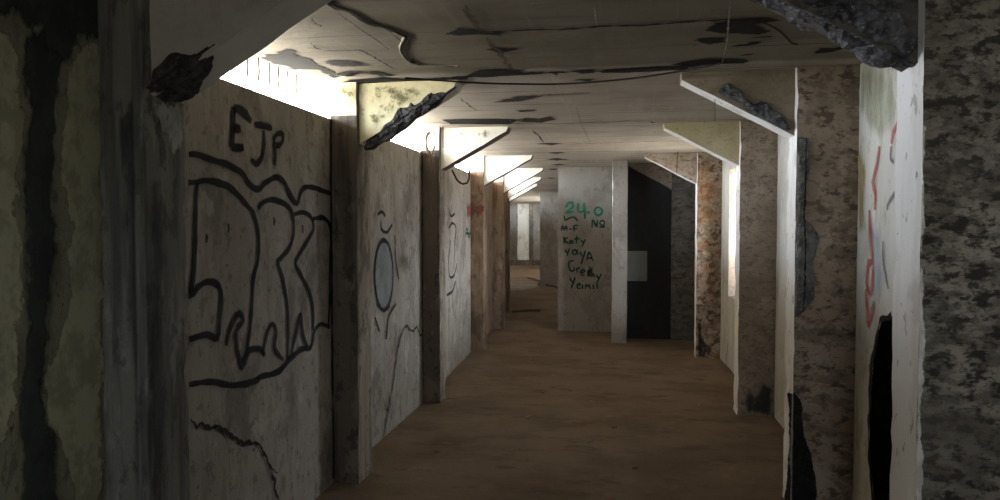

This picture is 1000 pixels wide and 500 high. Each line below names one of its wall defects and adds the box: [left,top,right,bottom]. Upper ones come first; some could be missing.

spalling [146,44,215,155]
spalling [363,86,457,151]
crack [311,5,770,145]
spalling [695,0,916,68]
water stain [0,0,99,500]
spalling [718,83,820,317]
crack [190,419,280,499]
spalling [784,392,817,500]
spalling [867,312,892,500]